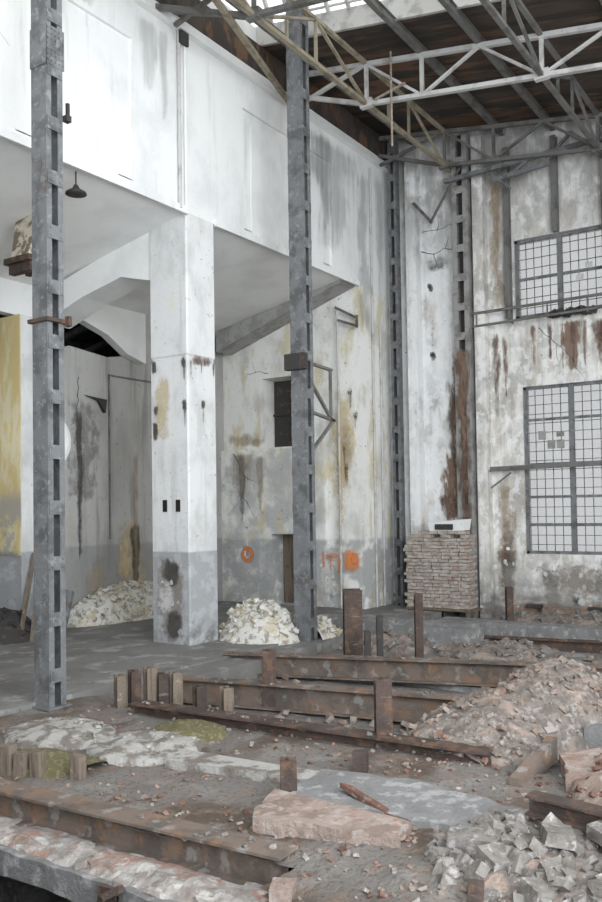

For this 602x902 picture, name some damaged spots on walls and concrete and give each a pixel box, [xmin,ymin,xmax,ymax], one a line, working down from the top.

rust [548,320,602,369]
rust [440,350,472,534]
leakage [120,526,143,582]
spalling [157,558,183,638]